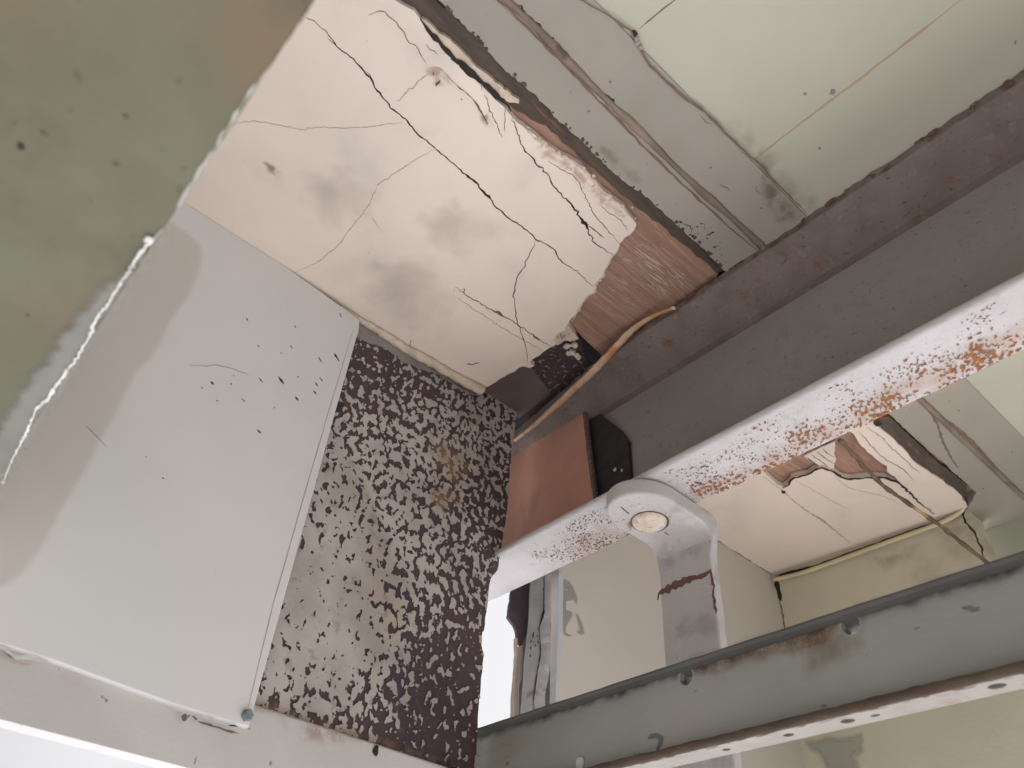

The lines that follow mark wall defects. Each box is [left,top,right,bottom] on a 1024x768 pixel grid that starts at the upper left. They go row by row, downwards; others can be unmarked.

crack [234,11,591,355]
crack [481,86,627,255]
flaking render [523,126,636,219]
peeling [623,242,685,297]
peeling [255,298,517,768]
peeling [803,440,836,469]
corrosion [653,303,1024,498]
crack [764,427,985,628]
crack [929,412,1002,473]